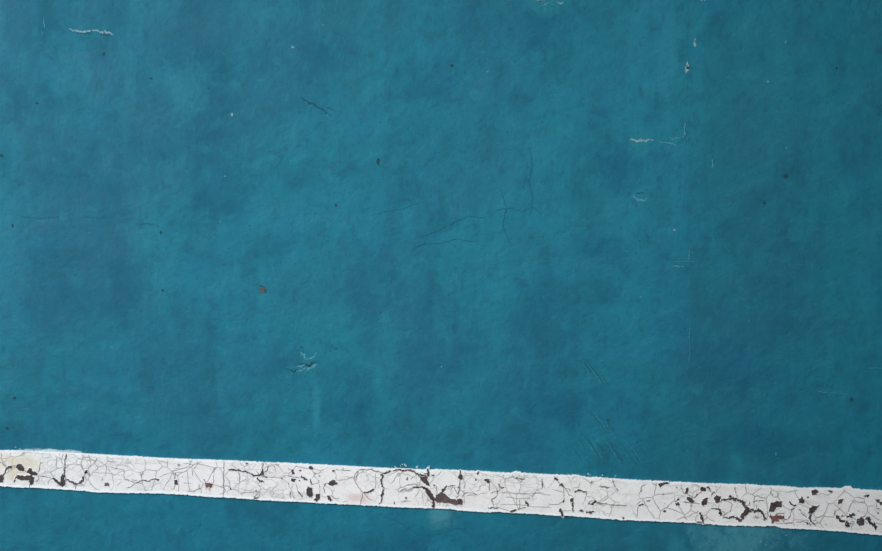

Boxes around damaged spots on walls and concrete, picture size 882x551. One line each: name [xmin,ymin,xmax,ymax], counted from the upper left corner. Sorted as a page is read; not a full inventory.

crack [0,455,16,483]
peeling [11,463,41,488]
crack [36,453,289,494]
peeling [285,465,353,503]
crack [354,467,465,505]
spalling [406,470,504,508]
crack [487,476,650,518]
crack [682,485,769,525]
peeling [754,490,882,531]
crack [799,488,860,528]